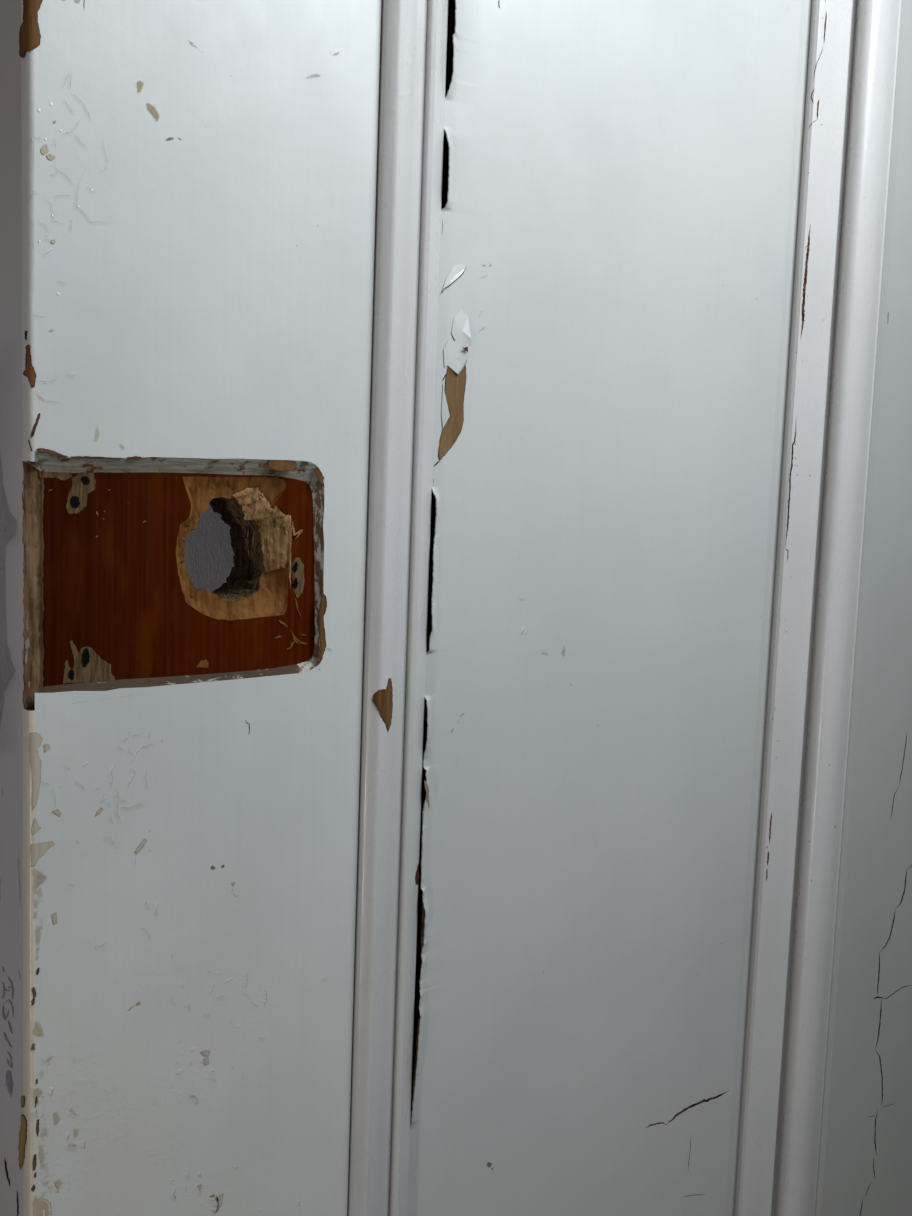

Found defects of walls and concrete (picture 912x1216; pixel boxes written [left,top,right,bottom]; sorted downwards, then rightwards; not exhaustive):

peeling [19,0,43,58]
peeling [434,310,471,466]
peeling [17,732,55,908]
peeling [372,678,393,731]
crack [890,731,908,821]
peeling [4,1057,62,1216]
crack [646,1090,729,1128]
crack [860,865,912,1215]